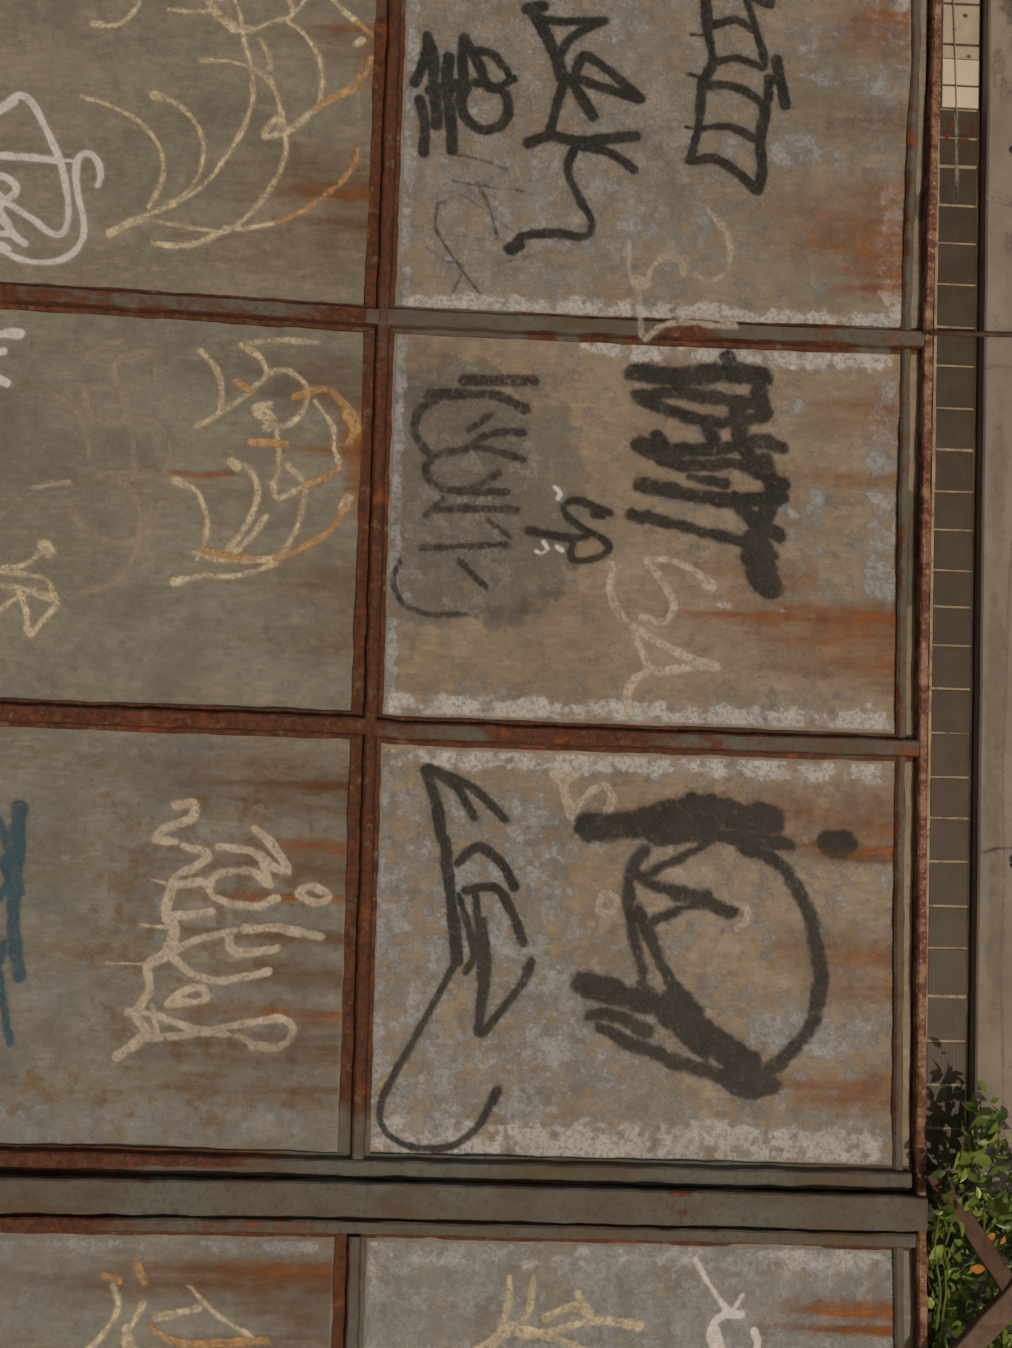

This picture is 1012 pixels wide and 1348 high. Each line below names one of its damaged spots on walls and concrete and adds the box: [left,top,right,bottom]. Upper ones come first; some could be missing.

corrosion [718,609,896,643]